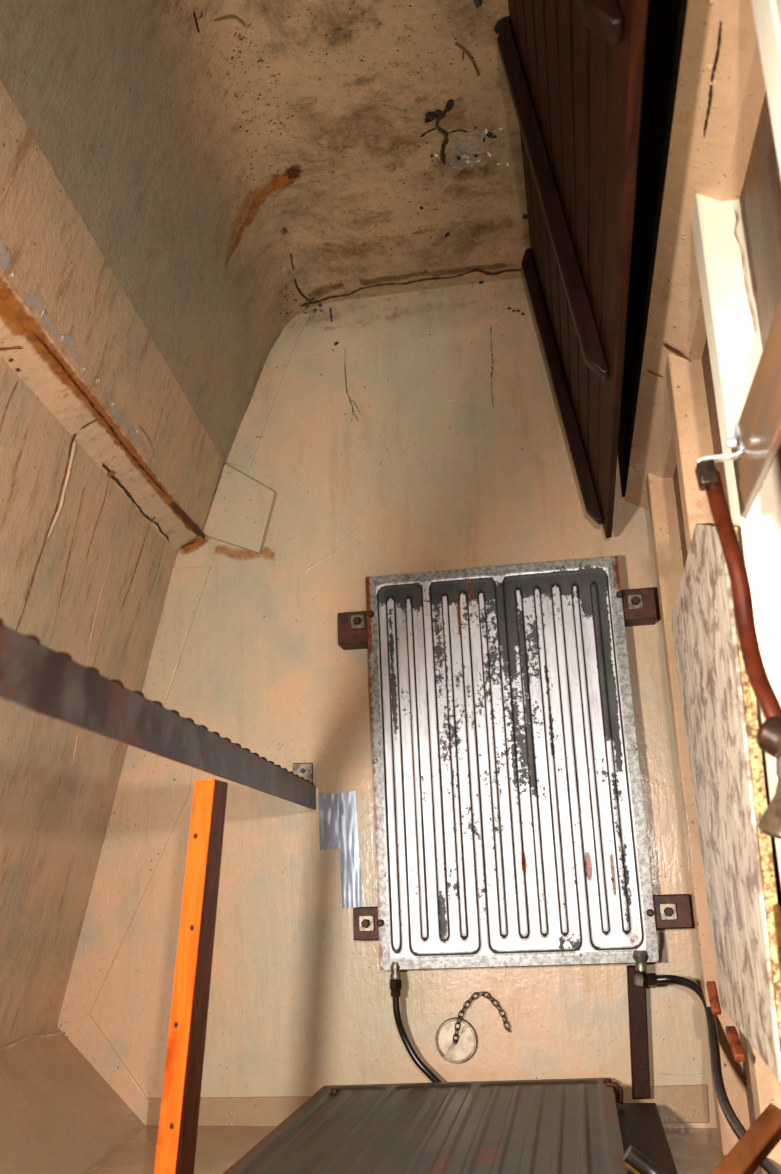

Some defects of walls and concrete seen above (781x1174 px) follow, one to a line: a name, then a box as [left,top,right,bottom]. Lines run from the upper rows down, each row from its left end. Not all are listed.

damp [229,27,351,186]
crack [420,99,467,165]
crack [704,22,722,135]
rust [225,166,302,262]
crack [290,254,521,322]
rust [0,278,207,631]
crack [102,463,169,542]